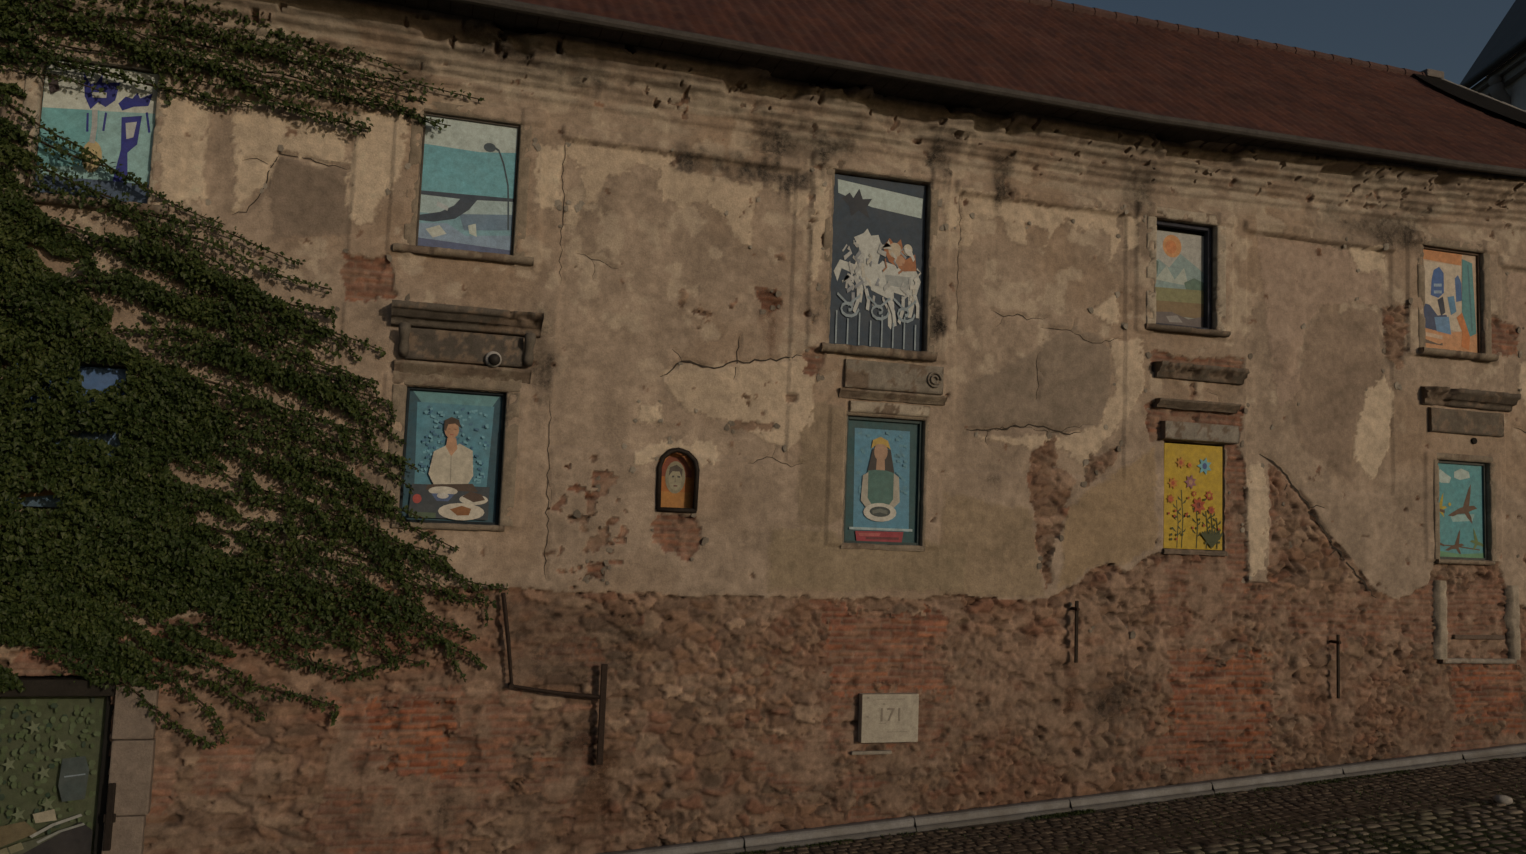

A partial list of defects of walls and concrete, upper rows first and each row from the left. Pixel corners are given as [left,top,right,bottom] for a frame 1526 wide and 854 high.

spalling [336,249,410,312]
peeling [548,348,825,585]
crack [660,336,802,378]
crack [956,195,1121,445]
spalling [974,291,1318,590]